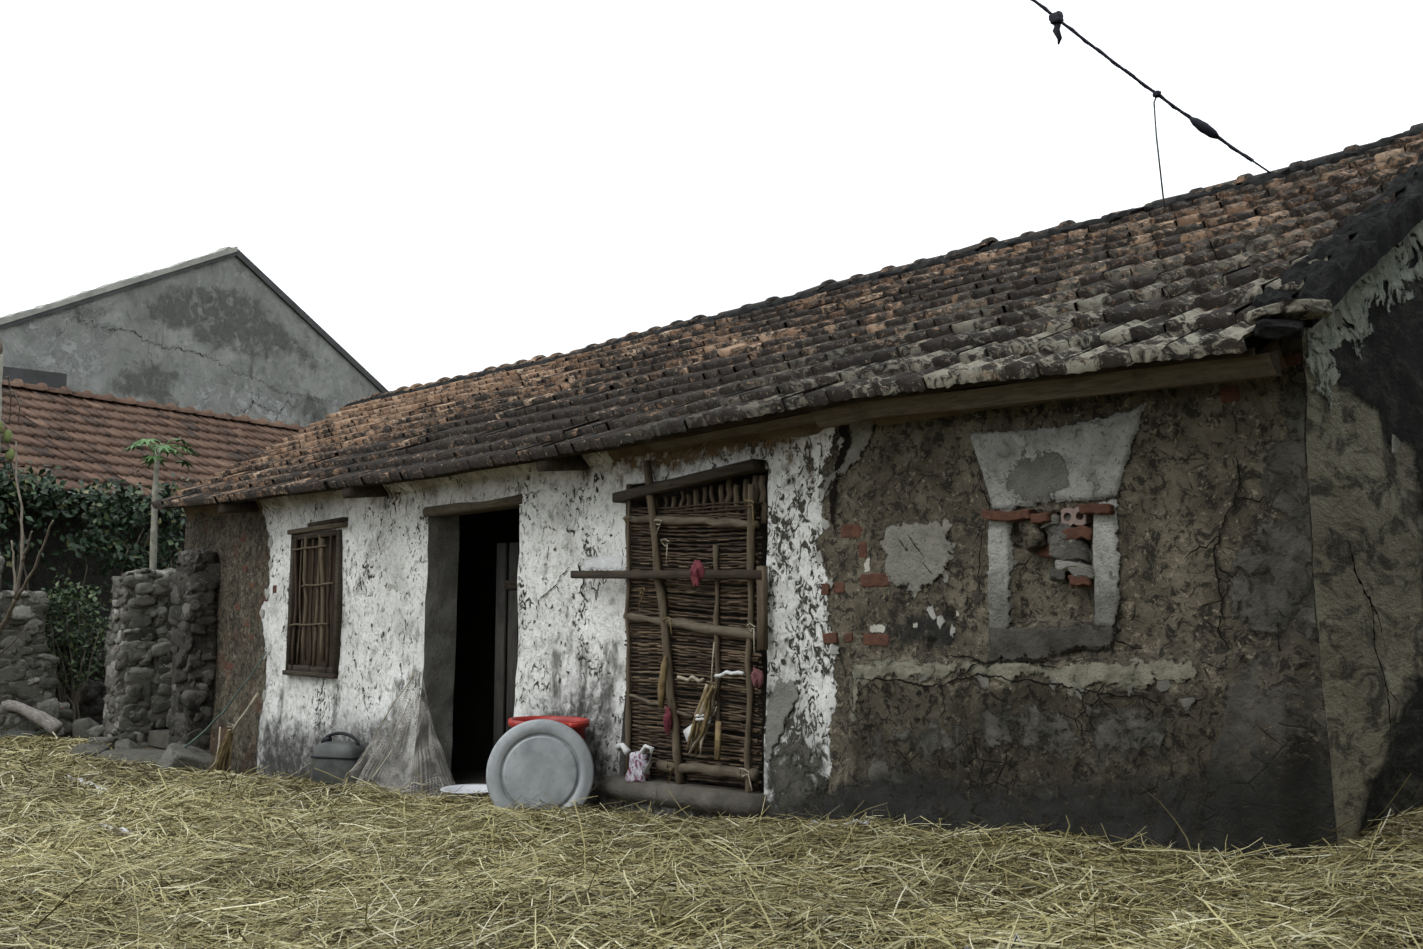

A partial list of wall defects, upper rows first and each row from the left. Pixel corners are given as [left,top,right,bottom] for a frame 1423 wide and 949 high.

damp [114,365,178,404]
crack [46,313,344,420]
damp [149,288,316,369]
spalling [805,220,1423,850]
crack [849,582,1199,734]